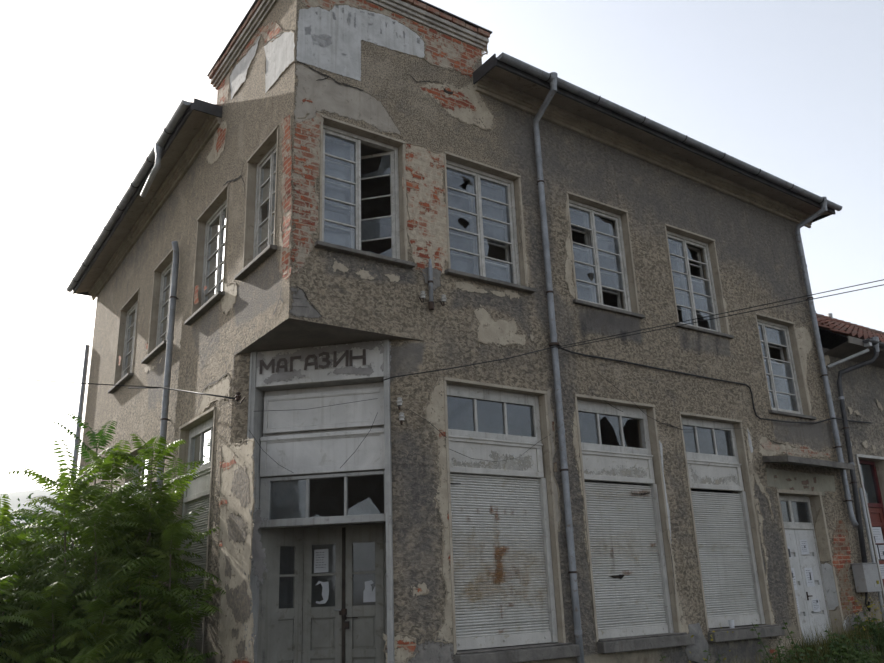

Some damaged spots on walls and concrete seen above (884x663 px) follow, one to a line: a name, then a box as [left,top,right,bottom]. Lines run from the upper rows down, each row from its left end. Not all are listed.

peeling [217,0,496,291]
peeling [454,280,521,300]
peeling [474,305,535,349]